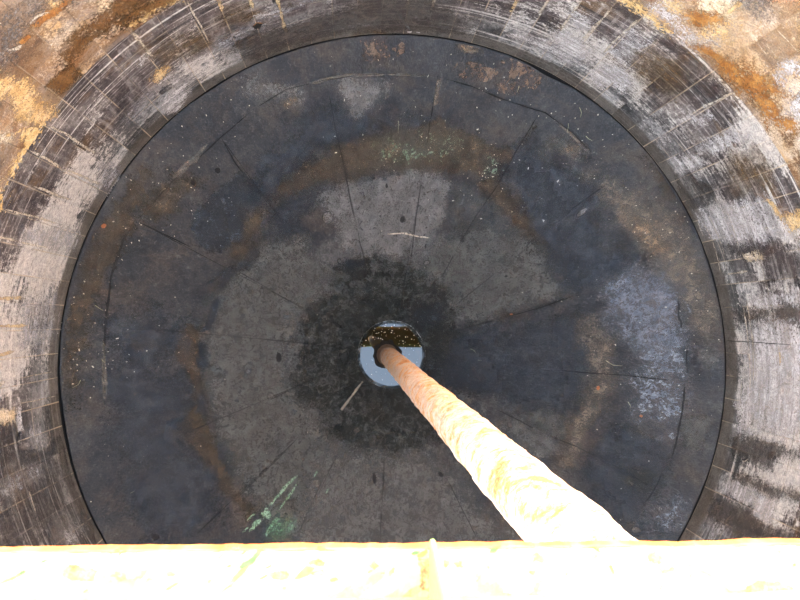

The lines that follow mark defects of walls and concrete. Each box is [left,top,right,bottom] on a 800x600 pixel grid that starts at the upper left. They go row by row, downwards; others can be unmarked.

rust [9,0,74,51]
rust [44,0,178,94]
rust [684,8,725,33]
damp [126,65,192,123]
rust [625,48,691,104]
damp [691,78,721,127]
rust [688,43,800,143]
damp [18,100,800,545]
crack [677,299,692,328]
crack [498,350,688,503]
damp [221,547,264,592]